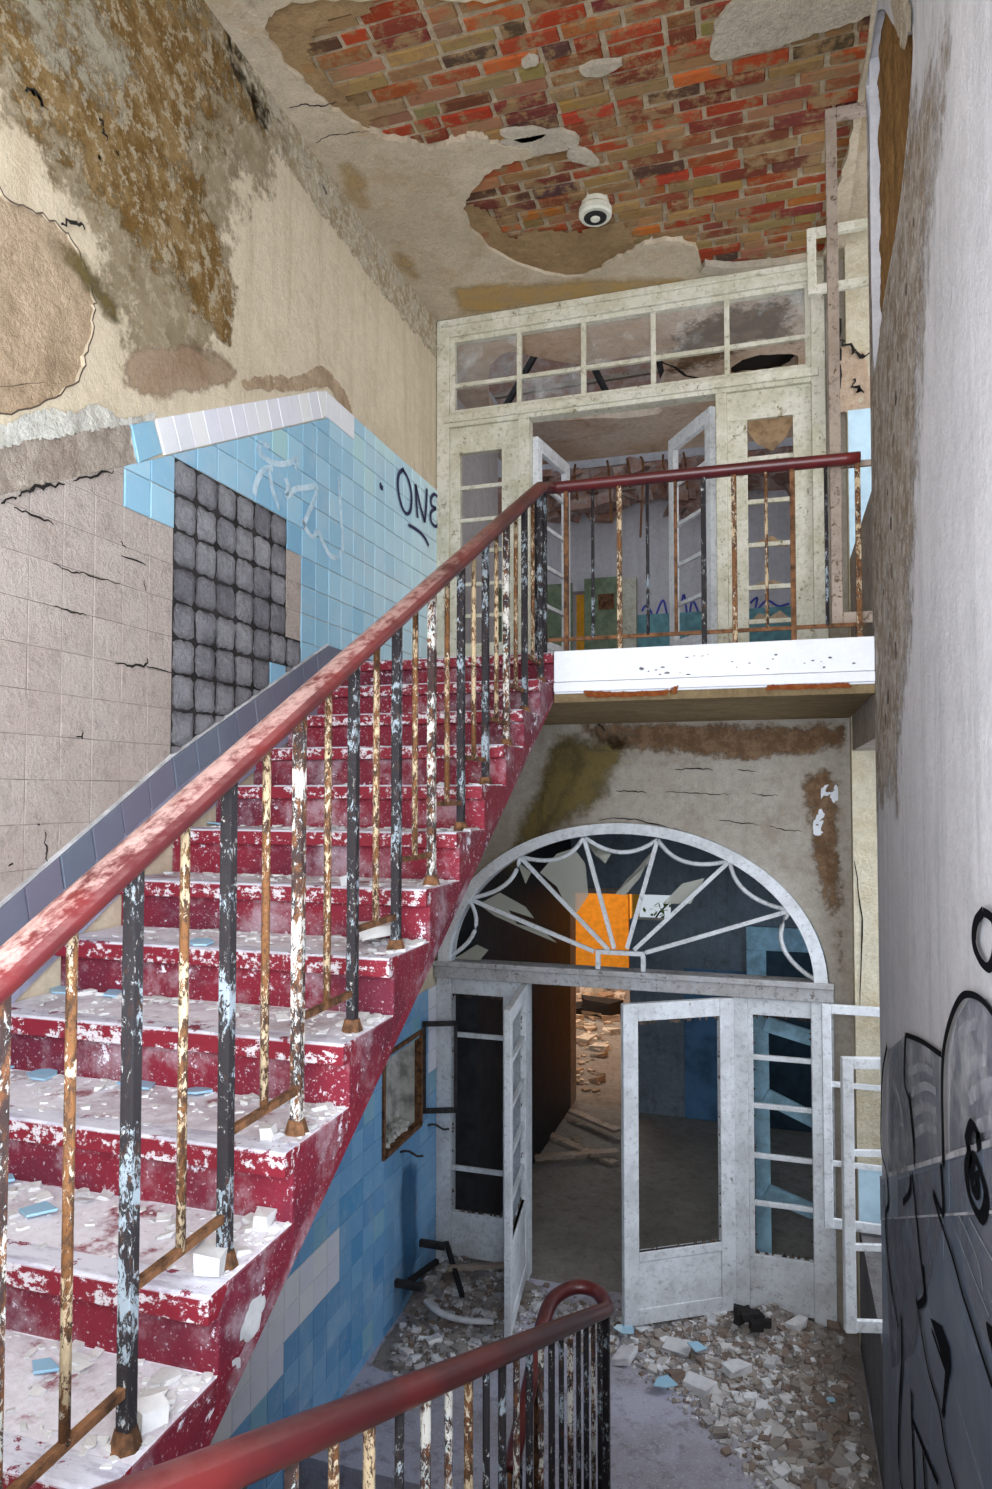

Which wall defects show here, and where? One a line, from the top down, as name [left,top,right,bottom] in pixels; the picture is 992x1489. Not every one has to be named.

leakage [0,0,290,357]
spalling [0,187,97,415]
crack [1,470,114,525]
crack [53,541,146,590]
spalling [265,0,950,825]
crack [115,659,172,673]
flaking render [0,425,301,902]
crack [8,823,48,867]
leakage [513,722,845,915]
peeling [813,783,838,836]